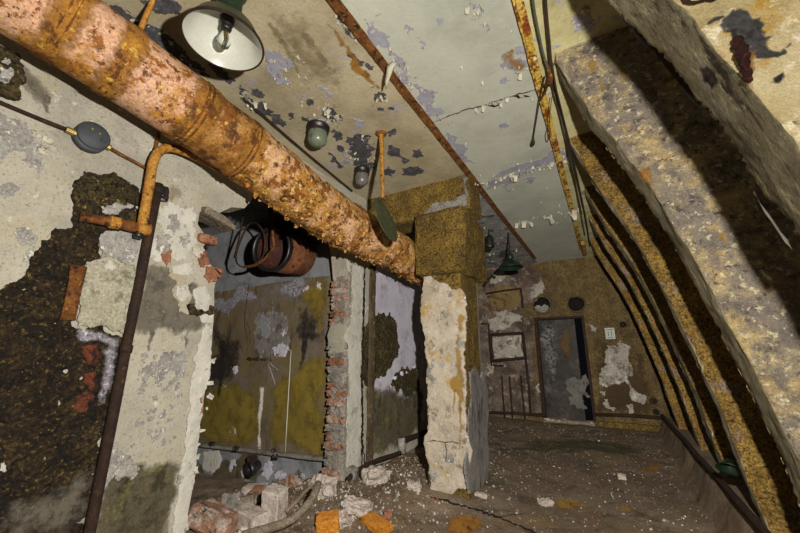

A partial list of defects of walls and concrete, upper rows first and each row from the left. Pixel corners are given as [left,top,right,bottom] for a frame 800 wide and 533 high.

peeling [140,0,182,15]
peeling [0,112,55,178]
peeling [106,3,424,177]
corrosion [336,32,379,89]
peeling [365,14,575,214]
crack [426,87,541,127]
corrosion [732,35,755,84]
peeling [488,228,545,332]
spalling [0,171,142,533]
corrosion [450,342,464,443]
peeling [599,340,647,414]
crack [430,496,535,533]